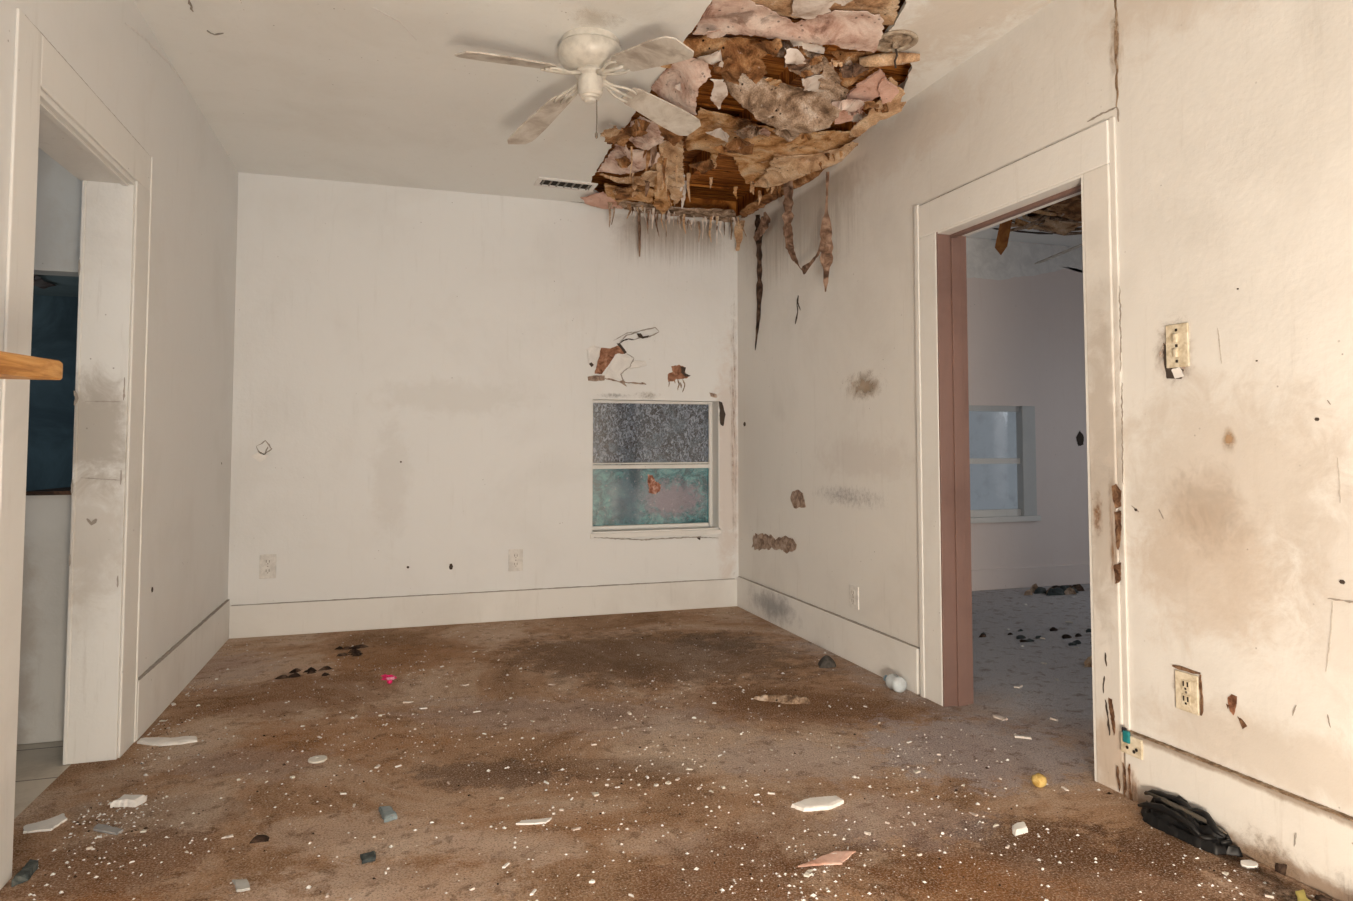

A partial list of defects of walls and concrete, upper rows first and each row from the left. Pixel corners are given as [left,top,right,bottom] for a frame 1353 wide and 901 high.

crack [1087,0,1119,122]
spalling [587,343,646,386]
spalling [668,365,690,392]
water stain [855,378,875,393]
spalling [790,490,806,509]
spalling [752,533,797,553]
spalling [1103,653,1115,735]
peeling [1226,694,1247,729]